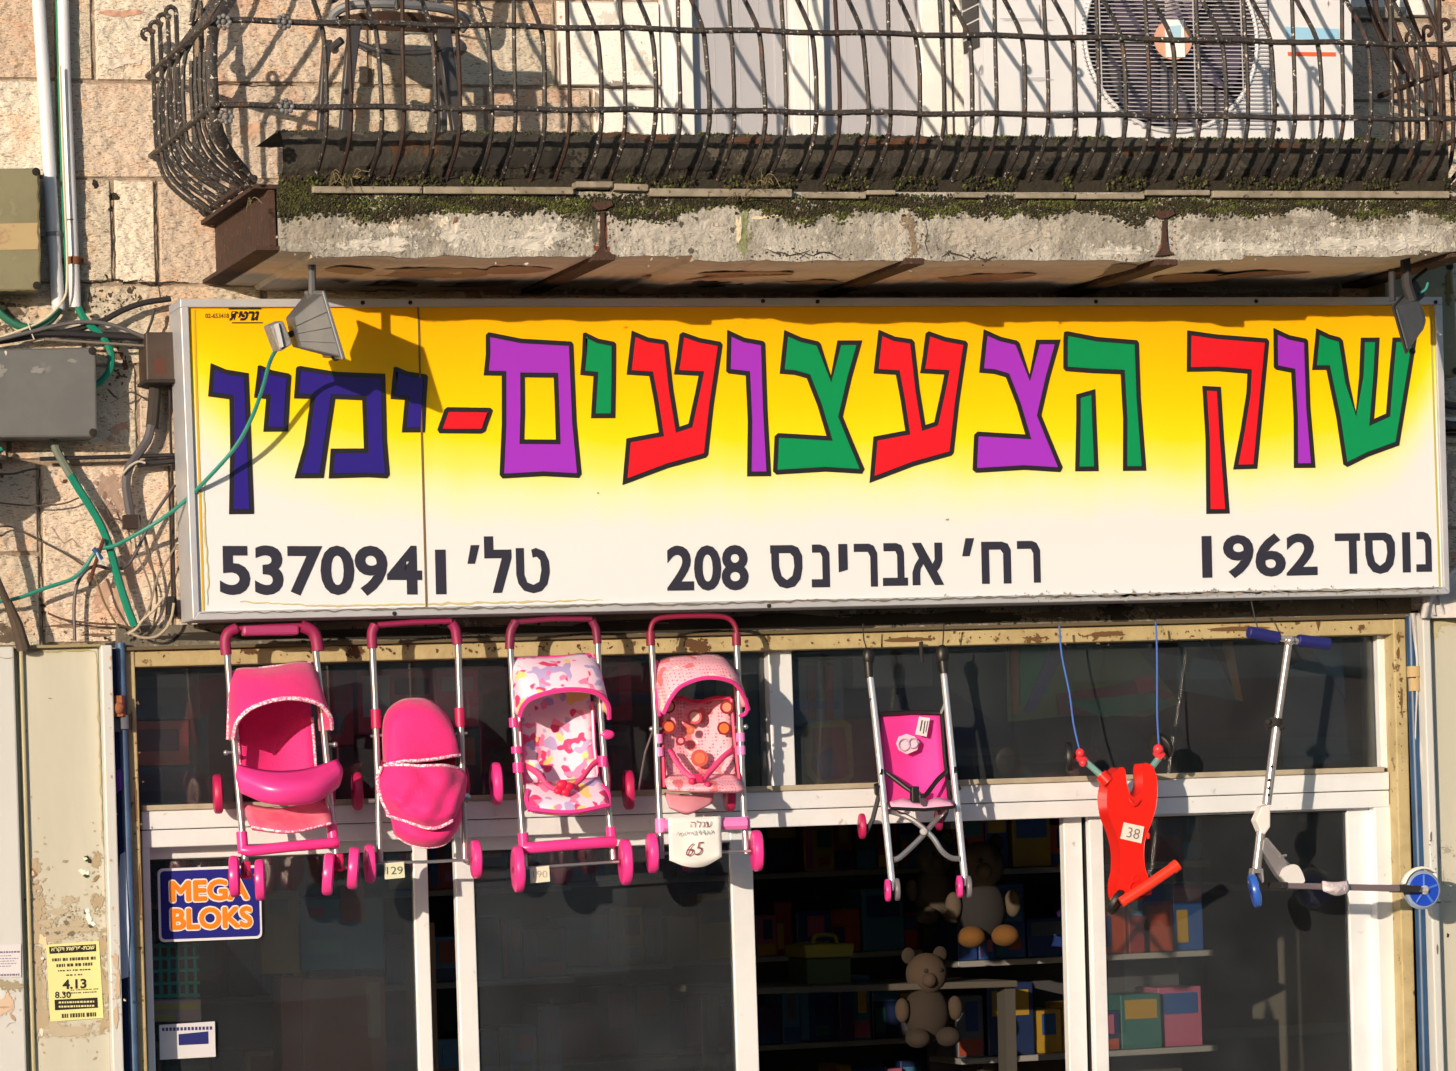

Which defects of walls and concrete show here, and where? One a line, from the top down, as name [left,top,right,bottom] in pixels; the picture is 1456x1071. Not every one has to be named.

corrosion [593,213,615,251]